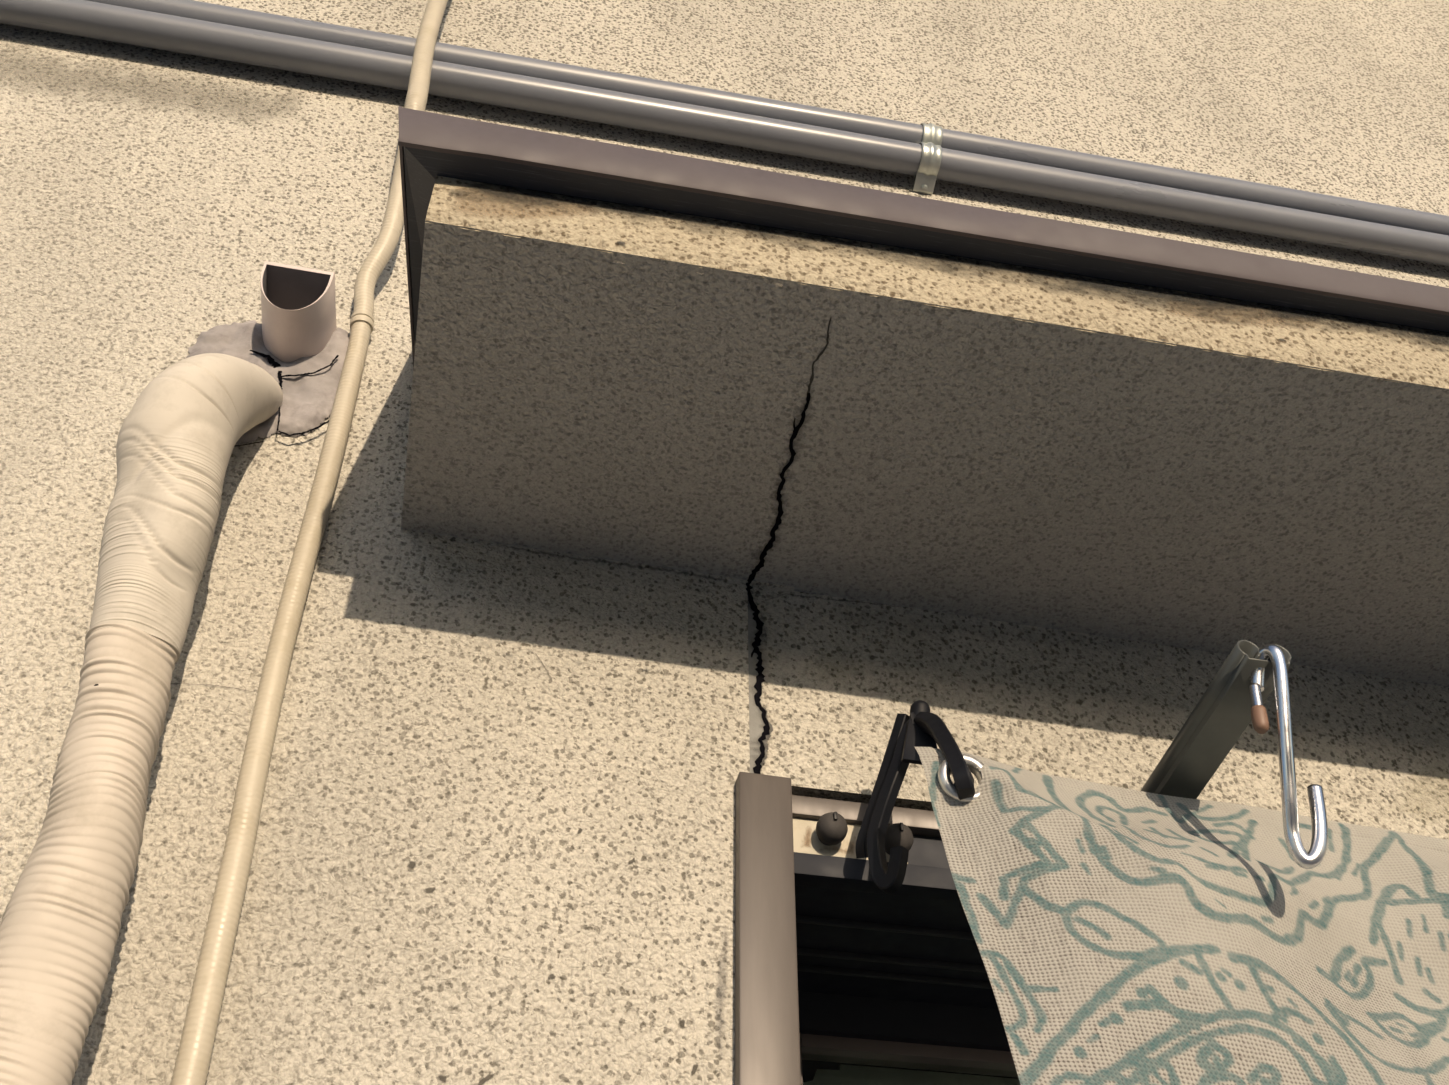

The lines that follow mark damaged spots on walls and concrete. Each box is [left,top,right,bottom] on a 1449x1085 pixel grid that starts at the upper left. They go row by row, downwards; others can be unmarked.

crack [746,317,832,774]